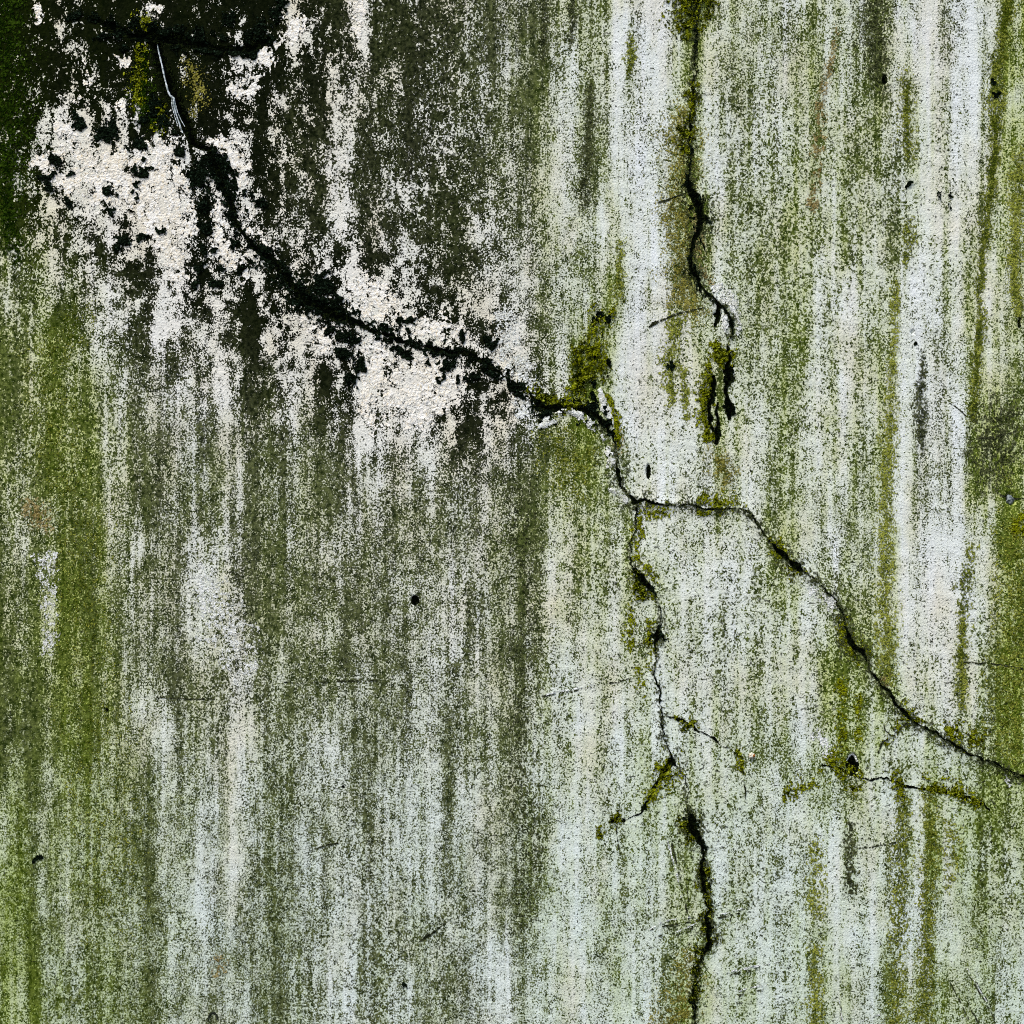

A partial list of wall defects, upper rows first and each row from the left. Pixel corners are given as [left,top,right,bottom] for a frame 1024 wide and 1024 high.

water stain [0,0,75,268]
water stain [68,106,154,217]
water stain [113,225,166,253]
crack [65,0,1024,834]
water stain [649,96,719,421]
water stain [864,280,933,687]
water stain [951,0,1024,769]
water stain [490,415,602,943]
crack [419,923,446,942]
crack [595,821,607,840]
crack [673,787,724,1024]
water stain [881,790,964,1024]